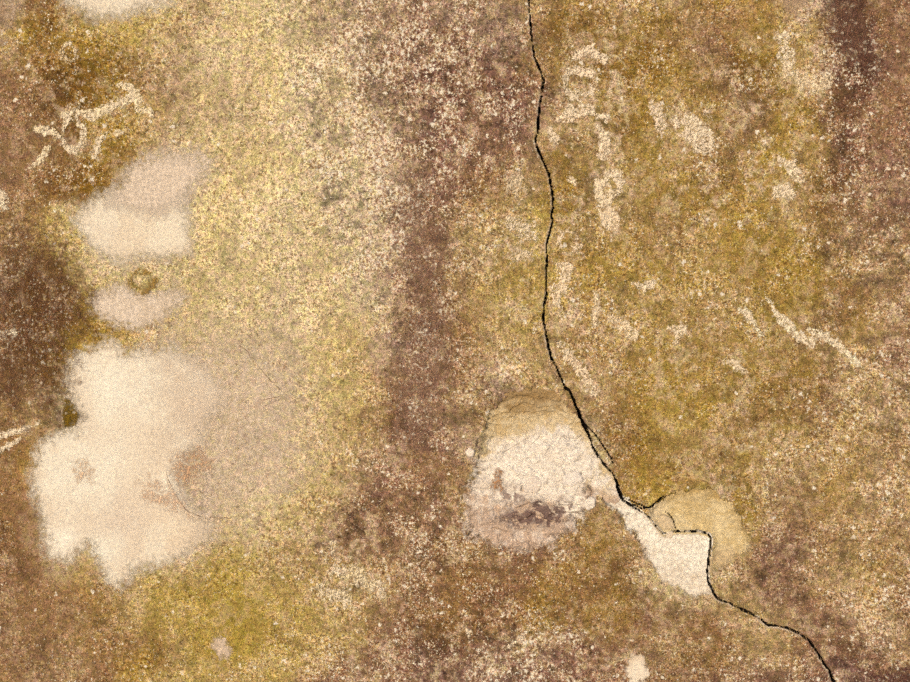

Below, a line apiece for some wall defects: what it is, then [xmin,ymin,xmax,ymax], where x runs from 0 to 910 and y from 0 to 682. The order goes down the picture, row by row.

water stain [128,268,159,296]
crack [528,0,835,682]
spalling [461,386,751,598]